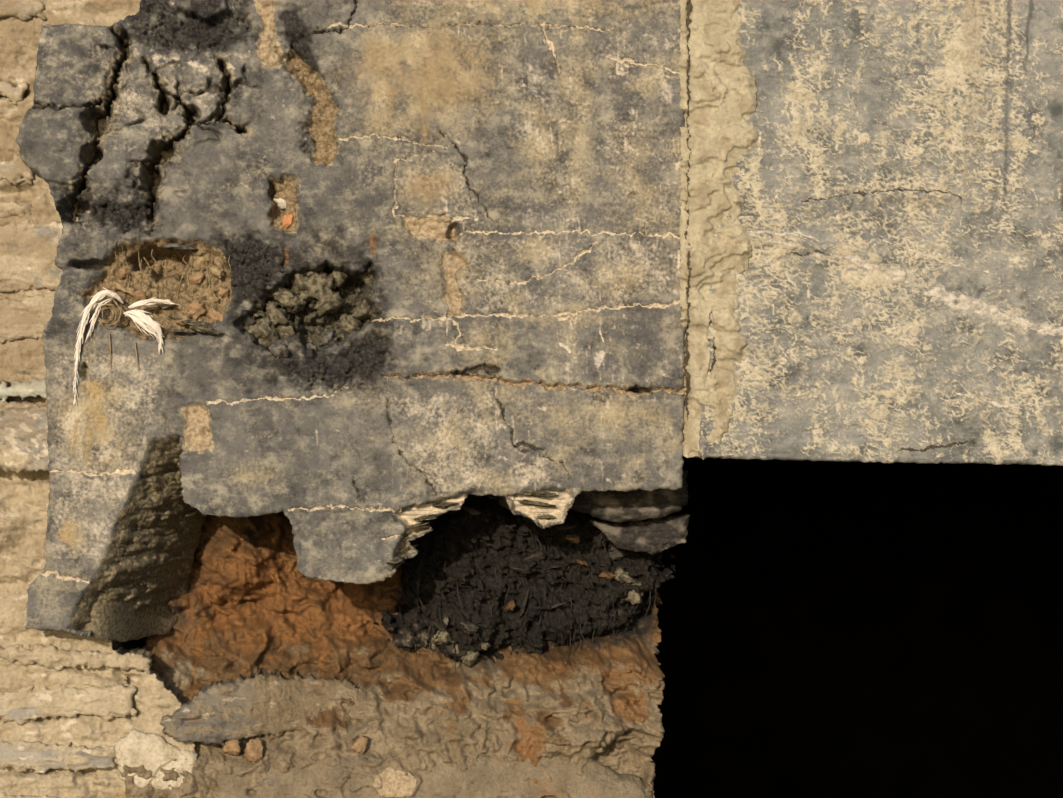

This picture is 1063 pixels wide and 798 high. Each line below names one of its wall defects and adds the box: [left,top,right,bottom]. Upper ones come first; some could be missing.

crack [31,28,247,224]
spalling [80,238,232,340]
spalling [238,263,382,359]
crack [313,0,716,489]
crack [206,386,349,406]
spalling [386,496,468,565]
spalling [510,489,572,528]